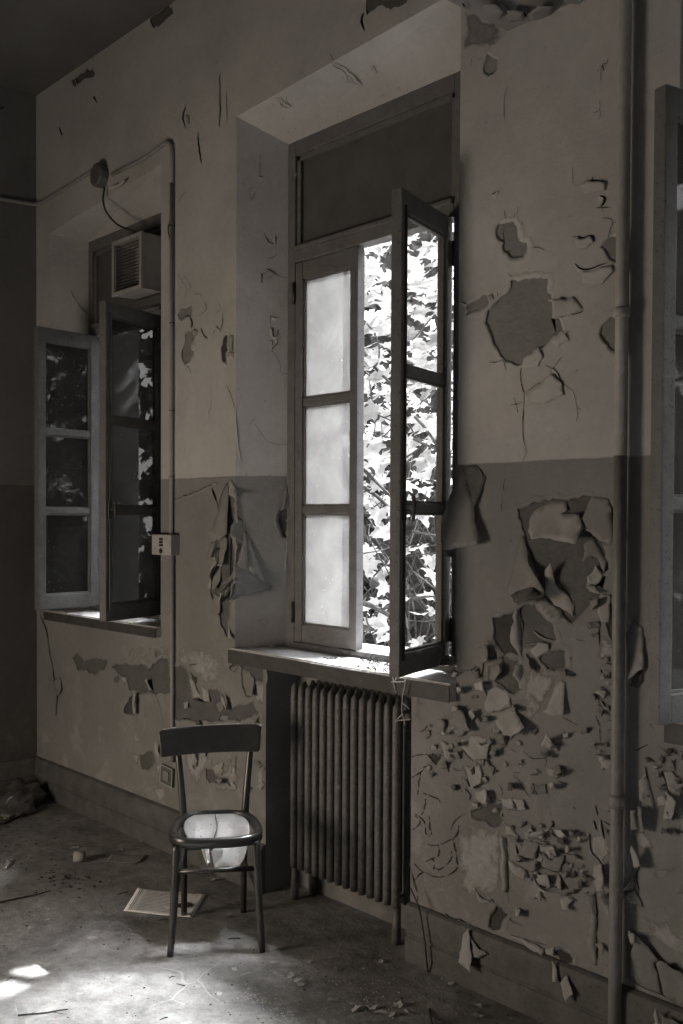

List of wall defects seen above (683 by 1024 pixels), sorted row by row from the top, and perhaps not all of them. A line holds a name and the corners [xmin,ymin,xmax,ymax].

peeling [459,208,583,369]
peeling [206,477,272,644]
peeling [441,465,486,557]
peeling [627,920,683,1005]